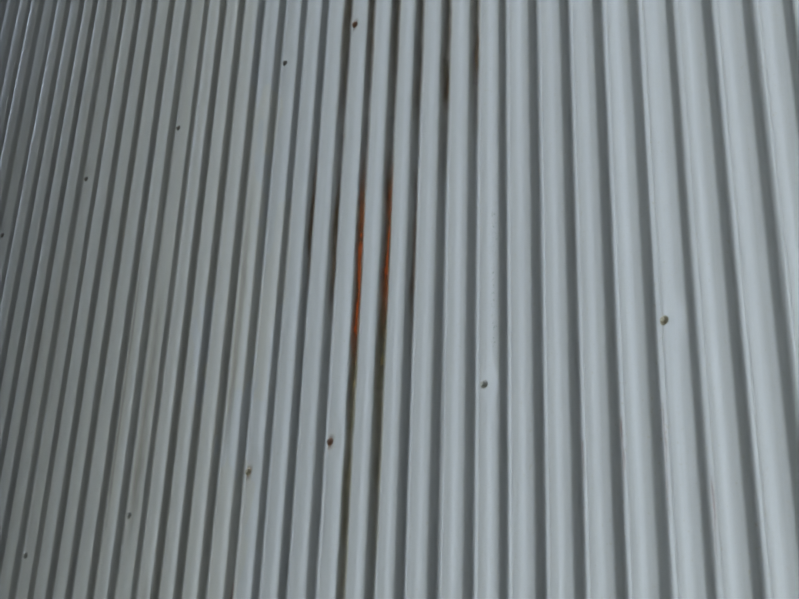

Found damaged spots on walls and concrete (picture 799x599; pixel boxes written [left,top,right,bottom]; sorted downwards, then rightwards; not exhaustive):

rust [353,196,364,343]
rust [383,185,391,299]